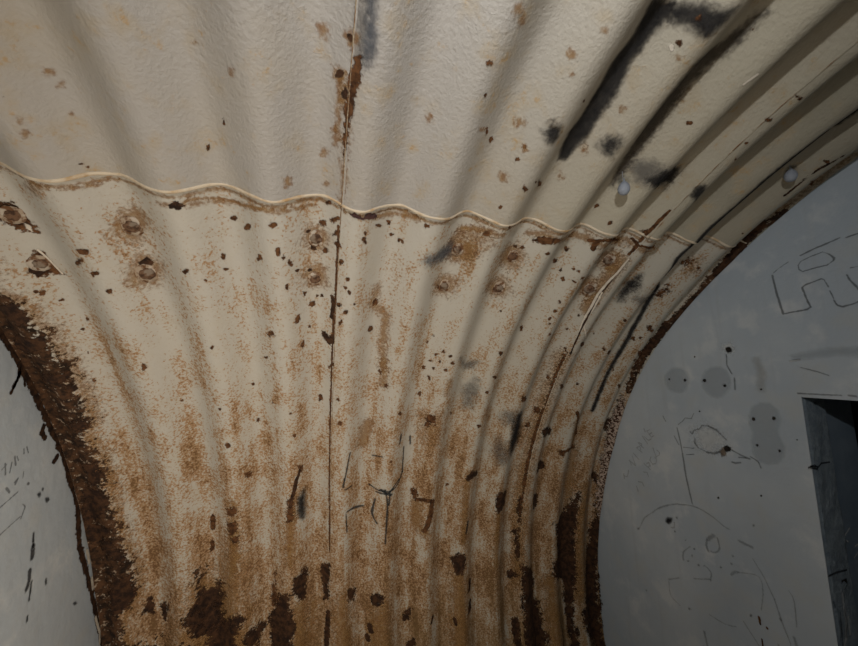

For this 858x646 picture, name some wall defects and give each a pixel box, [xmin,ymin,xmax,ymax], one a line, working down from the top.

rust [321,55,362,174]
rust [617,155,850,399]
rust [0,290,331,646]
rust [370,592,386,607]
rust [449,470,478,614]
rust [492,347,606,646]